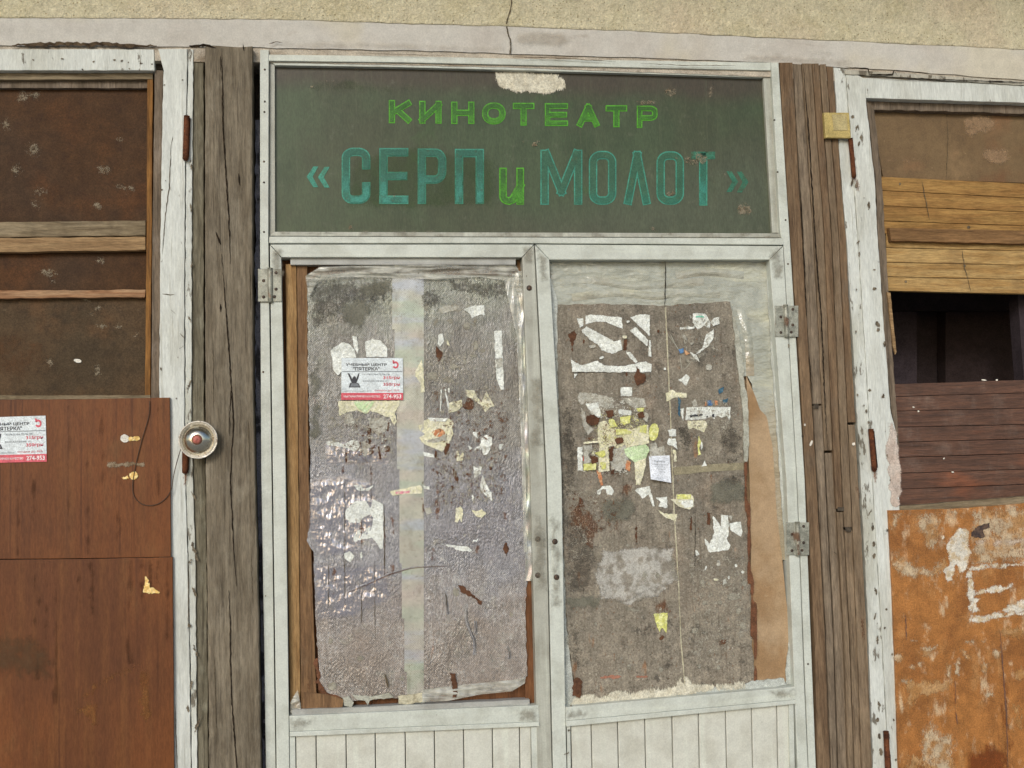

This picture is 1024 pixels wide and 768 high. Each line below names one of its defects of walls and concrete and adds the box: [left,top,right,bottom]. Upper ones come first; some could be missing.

crack [506,0,612,62]
peeling [971,506,1024,564]